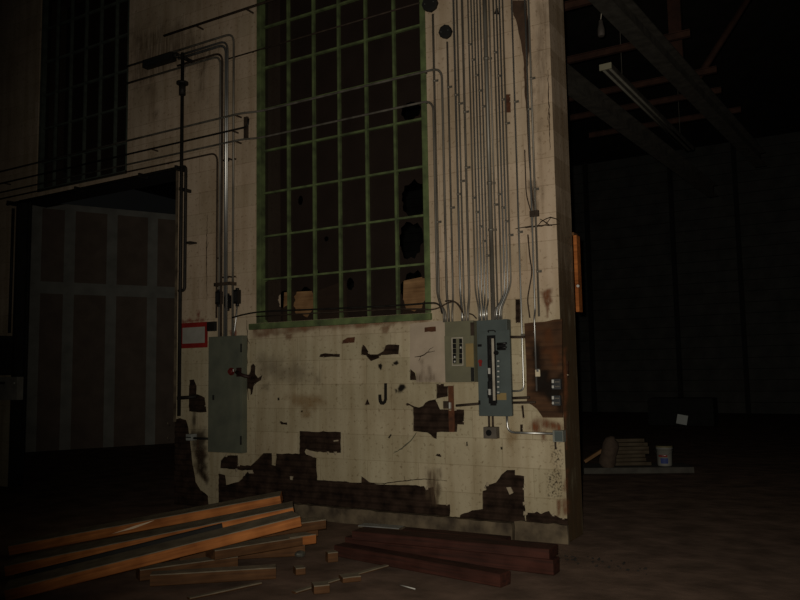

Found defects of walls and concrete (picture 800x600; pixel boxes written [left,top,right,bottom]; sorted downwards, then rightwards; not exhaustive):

spalling [342,337,399,361]
spalling [247,364,262,395]
spalling [406,382,465,439]
rust [533,244,583,542]
spalling [167,380,208,507]
water stain [193,433,206,481]
spalling [217,431,450,516]
spalling [460,470,568,525]